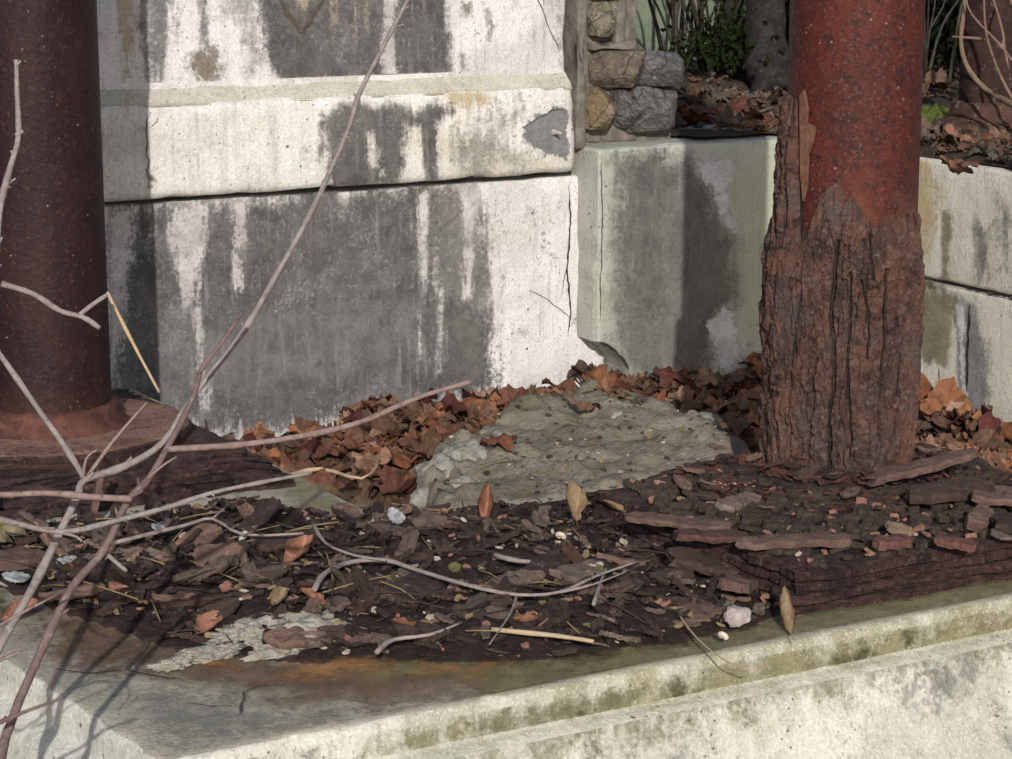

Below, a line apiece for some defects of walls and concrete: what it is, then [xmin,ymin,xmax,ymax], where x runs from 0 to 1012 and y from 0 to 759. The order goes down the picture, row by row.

water stain [138,0,178,81]
water stain [190,0,221,81]
water stain [242,0,452,78]
crack [145,113,159,188]
spalling [522,105,570,160]
water stain [106,91,502,436]
crack [532,162,603,332]
water stain [611,151,744,377]
water stain [942,212,952,280]
water stain [973,220,991,280]
water stain [955,295,990,410]